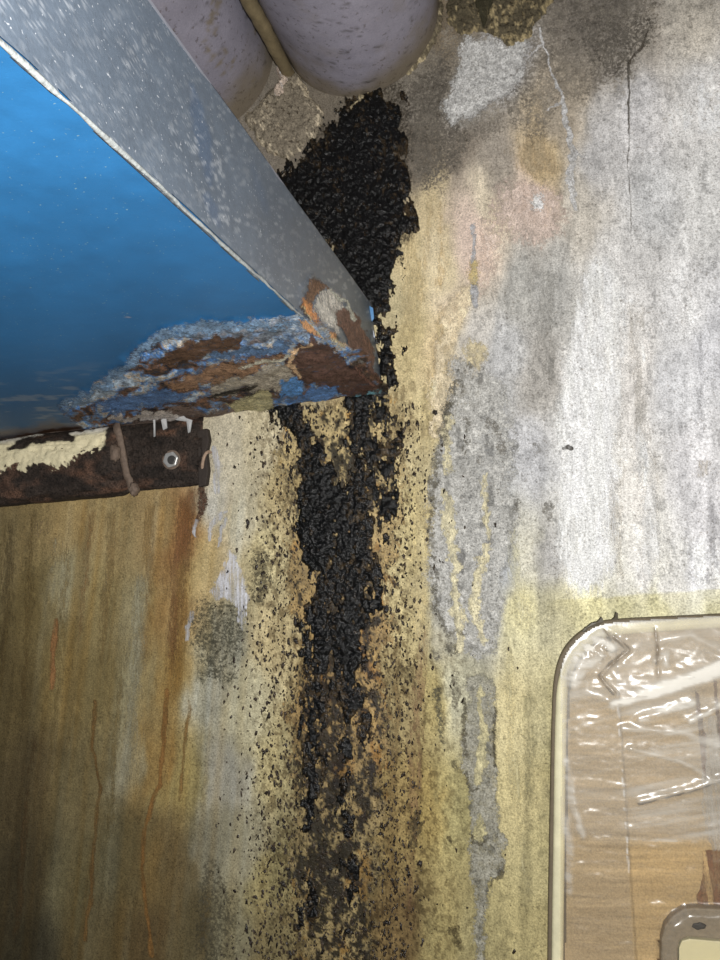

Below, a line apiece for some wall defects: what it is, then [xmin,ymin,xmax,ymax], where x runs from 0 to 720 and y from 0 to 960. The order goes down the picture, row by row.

crack [627,30,649,191]
corrosion [124,404,246,425]
corrosion [161,277,384,401]
leakage [185,0,662,960]
corrosion [167,486,208,677]
corrosion [140,688,169,958]
corrosion [179,715,189,797]